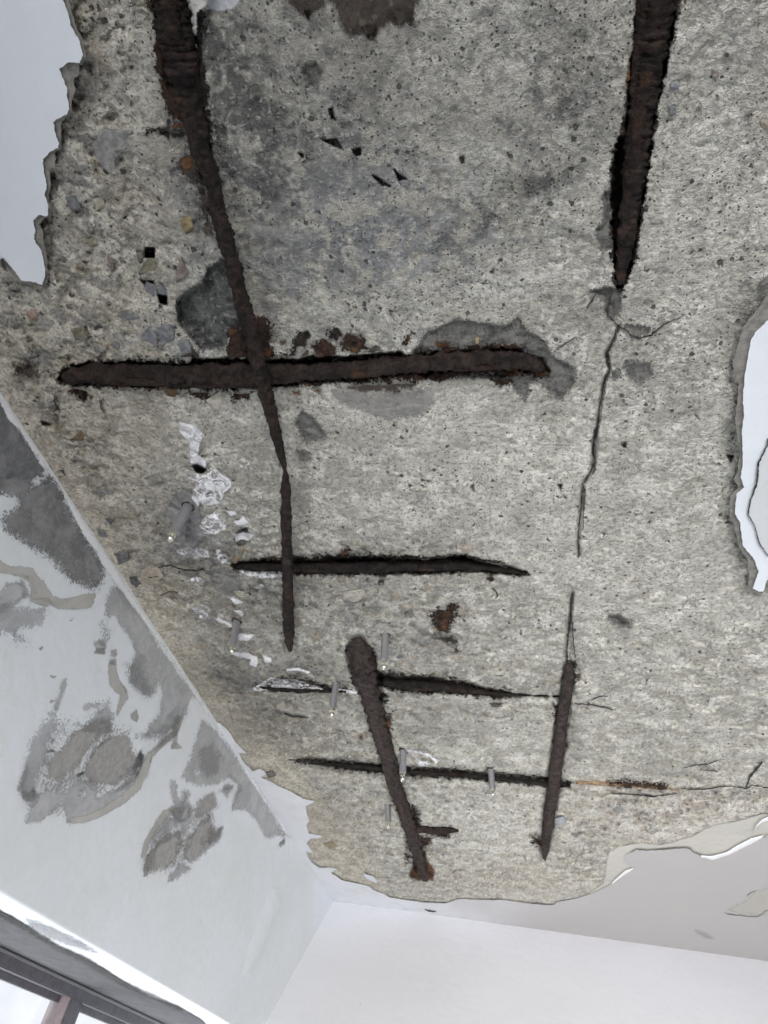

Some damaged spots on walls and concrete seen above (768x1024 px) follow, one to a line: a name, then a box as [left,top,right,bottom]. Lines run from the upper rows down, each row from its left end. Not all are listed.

peeling [0,0,86,286]
rust [608,0,682,293]
peeling [16,482,193,826]
water stain [179,422,254,542]
water stain [193,597,272,667]
water stain [177,547,293,587]
water stain [246,668,323,692]
rust [53,0,550,655]
rust [253,637,678,882]
spalling [411,317,577,402]
crack [578,287,683,556]
peeling [729,295,768,595]